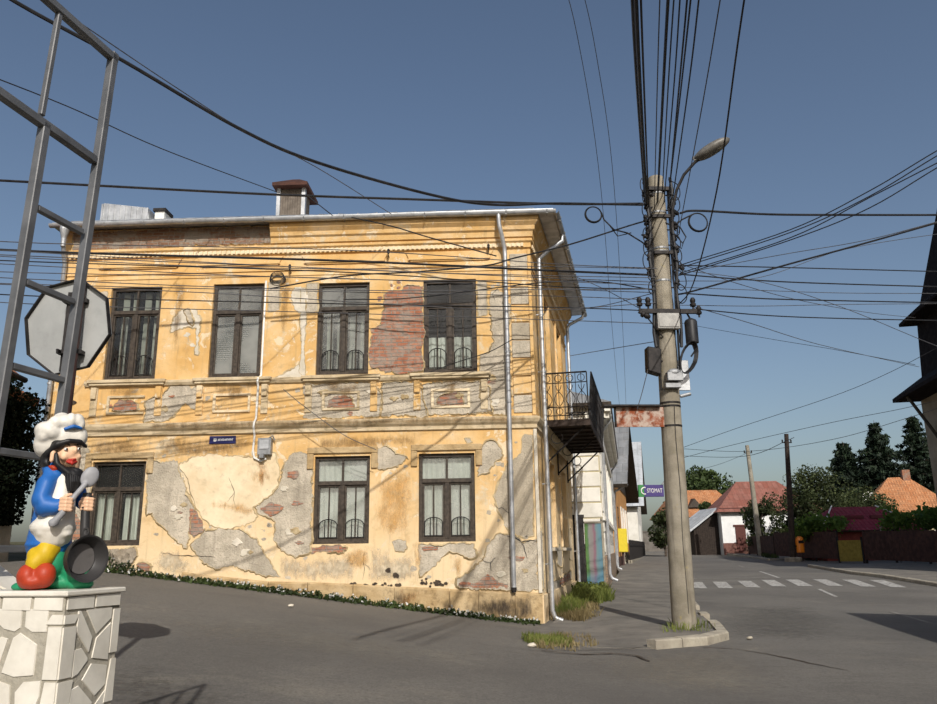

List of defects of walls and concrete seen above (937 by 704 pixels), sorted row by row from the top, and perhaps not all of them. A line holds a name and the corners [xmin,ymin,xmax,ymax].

peeling [170,308,202,356]
spalling [267,279,514,419]
spalling [79,439,91,471]
spalling [377,445,409,475]
spalling [72,507,81,542]
peeling [145,449,348,579]
spalling [392,434,573,593]
spalling [107,545,153,573]
peeling [350,568,401,587]